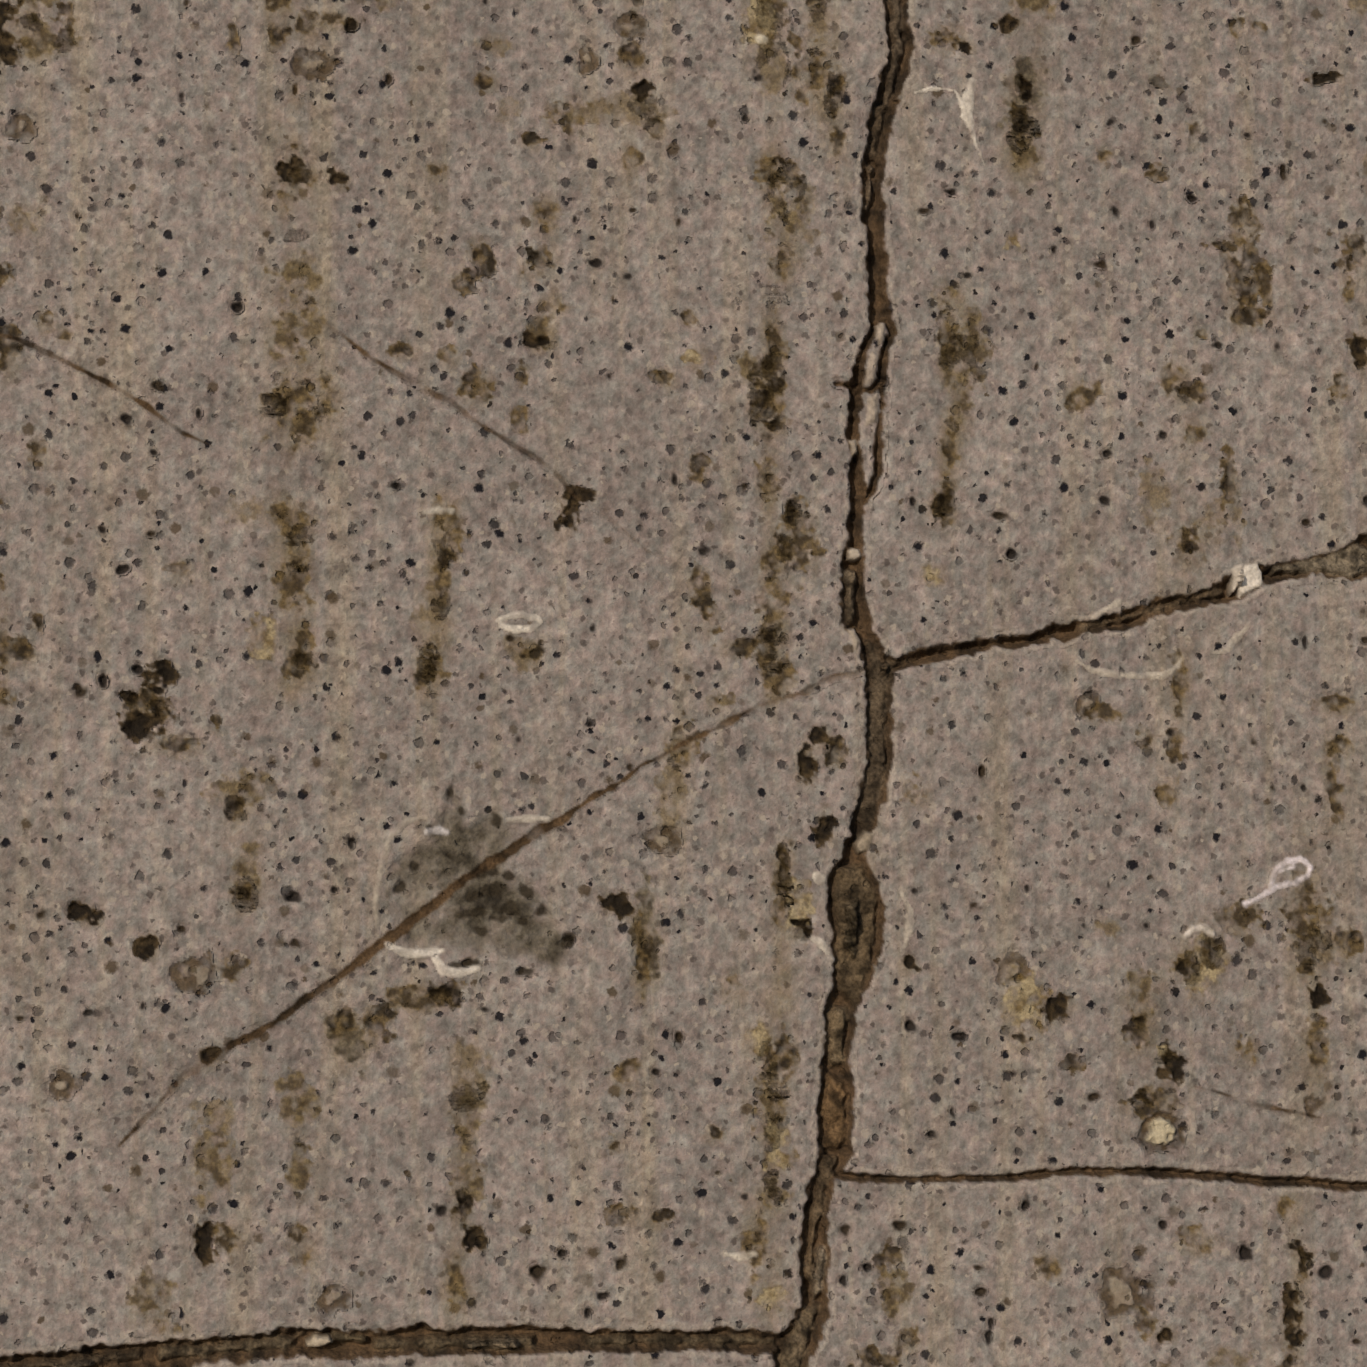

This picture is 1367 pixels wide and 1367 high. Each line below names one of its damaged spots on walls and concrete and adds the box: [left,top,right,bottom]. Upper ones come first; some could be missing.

crack [0,331,214,447]
crack [323,321,652,555]
crack [766,0,1367,1367]
crack [116,668,864,1149]
crack [0,1313,786,1367]